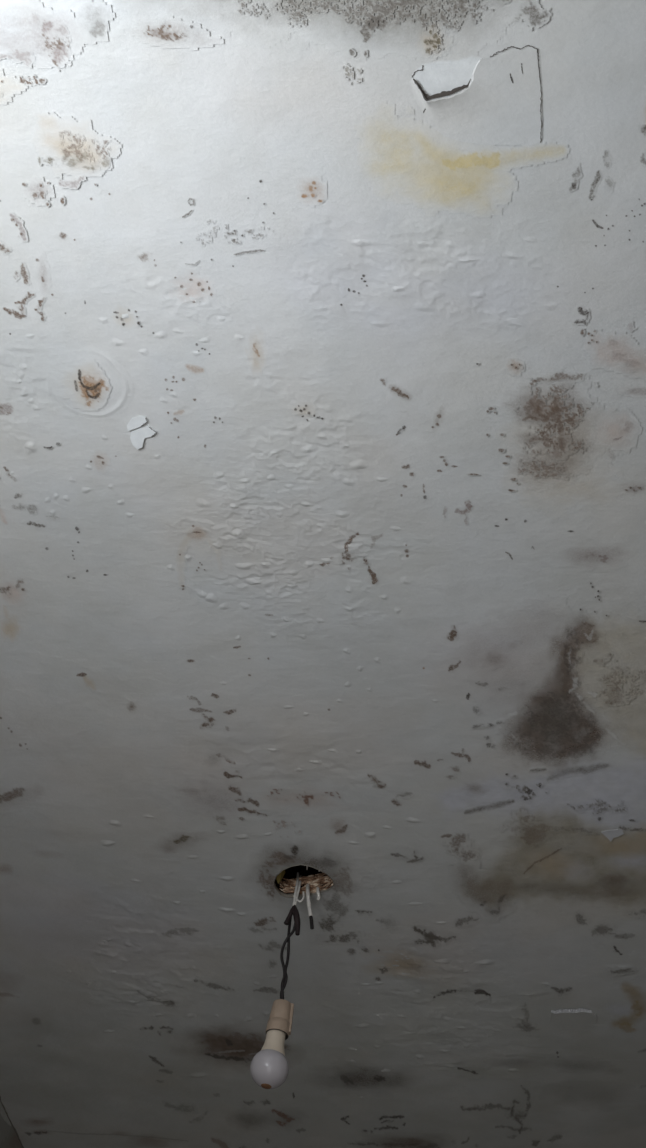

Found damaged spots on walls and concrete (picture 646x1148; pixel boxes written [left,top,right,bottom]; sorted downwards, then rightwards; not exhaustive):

damp [0,0,552,105]
peeling [407,45,543,145]
damp [354,101,615,218]
rust [73,370,112,409]
damp [379,378,413,402]
peeling [127,416,157,450]
damp [319,531,384,586]
damp [413,287,646,848]
spalling [275,865,330,894]
damp [149,751,523,983]
damp [139,1018,267,1084]
damp [284,1034,425,1097]